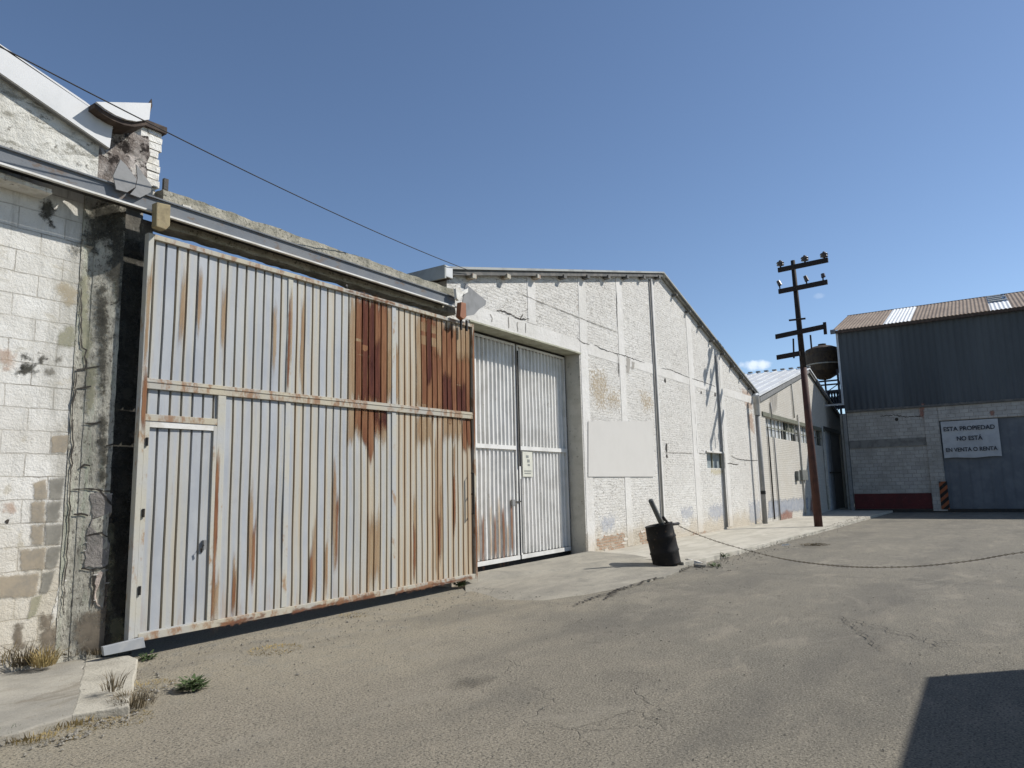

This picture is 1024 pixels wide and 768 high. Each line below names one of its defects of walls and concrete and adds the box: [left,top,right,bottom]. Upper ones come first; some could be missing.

water stain [39,199,56,228]
spalling [97,132,150,189]
crack [62,288,113,614]
water stain [59,203,143,652]
rust [346,290,399,460]
rust [396,314,513,595]
spalling [84,492,112,608]
rust [211,461,264,626]